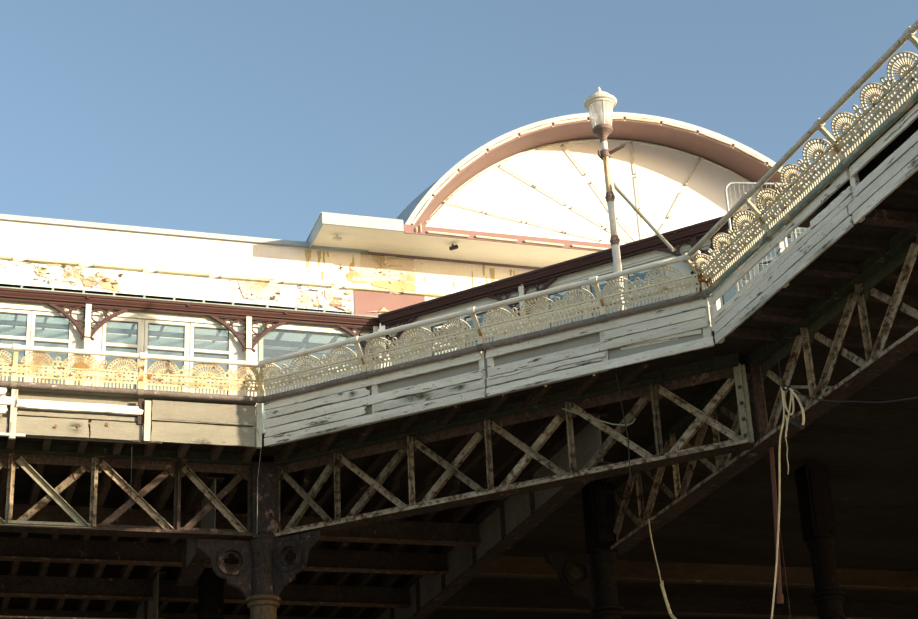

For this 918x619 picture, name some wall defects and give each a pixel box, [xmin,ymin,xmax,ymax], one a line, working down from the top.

peeling [35,264,126,292]
peeling [230,279,281,302]
peeling [292,252,423,312]